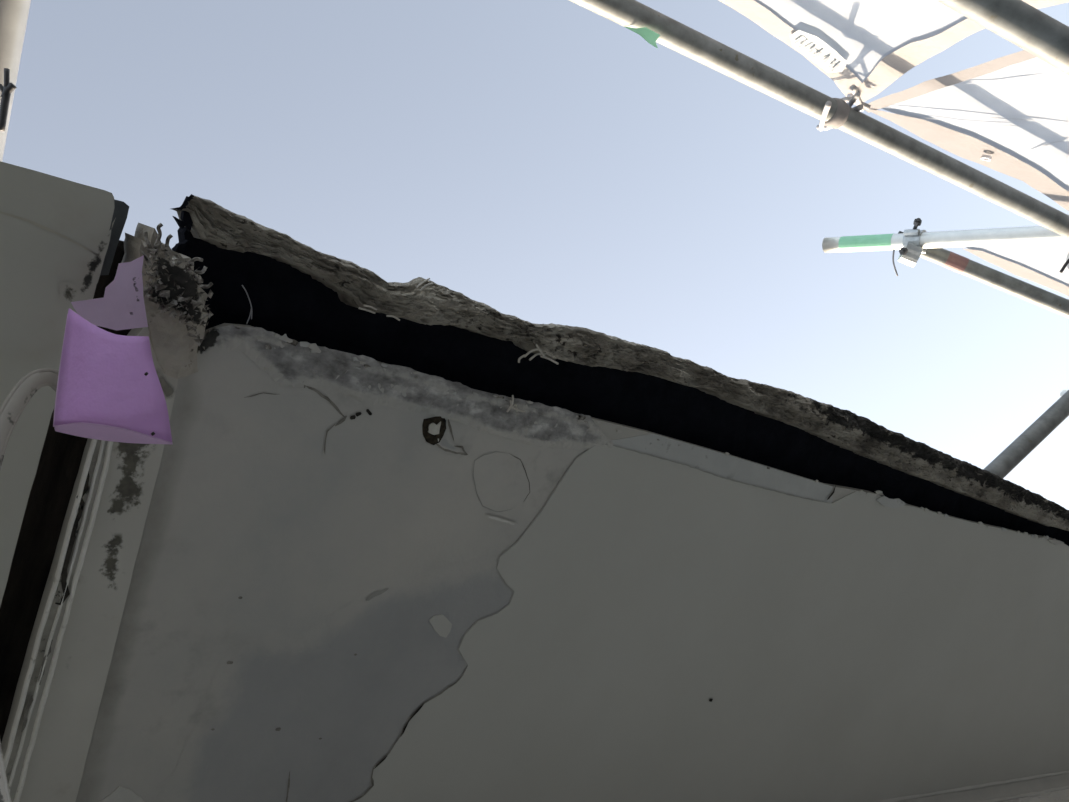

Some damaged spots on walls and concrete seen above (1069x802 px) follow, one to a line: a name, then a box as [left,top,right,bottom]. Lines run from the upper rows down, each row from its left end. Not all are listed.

peeling [55,471,90,605]
water stain [94,434,163,594]
peeling [75,222,836,802]
spalling [859,490,906,508]
spalling [978,521,1064,545]